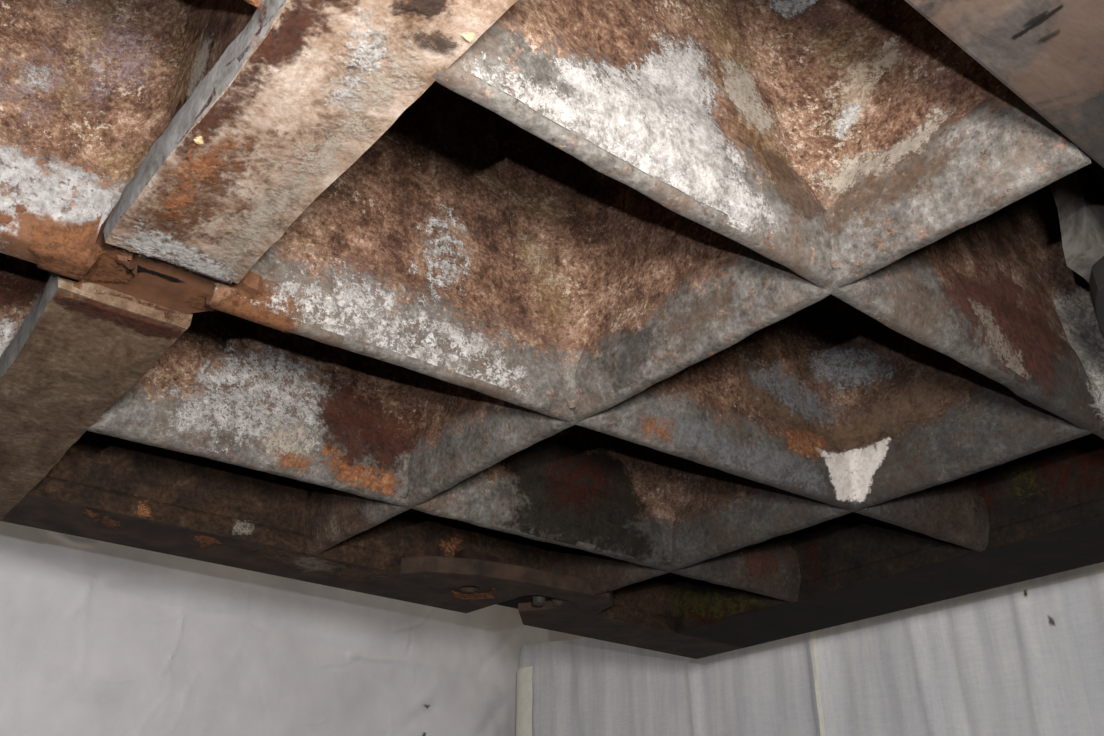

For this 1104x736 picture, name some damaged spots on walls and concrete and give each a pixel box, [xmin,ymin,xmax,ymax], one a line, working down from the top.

corrosion [0,202,26,226]
corrosion [0,216,182,340]
corrosion [189,279,306,333]
corrosion [275,441,404,496]
damp [316,380,424,475]
peeling [625,405,891,503]